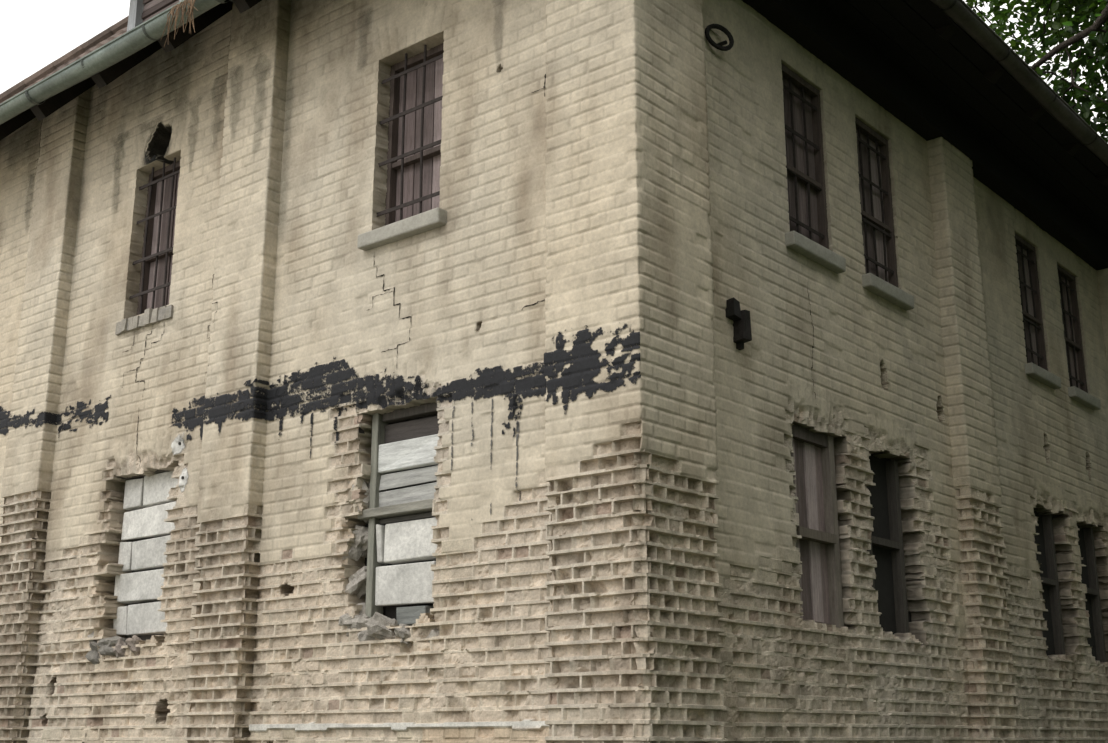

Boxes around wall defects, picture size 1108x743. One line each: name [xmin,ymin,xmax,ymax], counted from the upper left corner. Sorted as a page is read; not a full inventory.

crack [368,272,412,355]
spalling [0,372,1108,743]